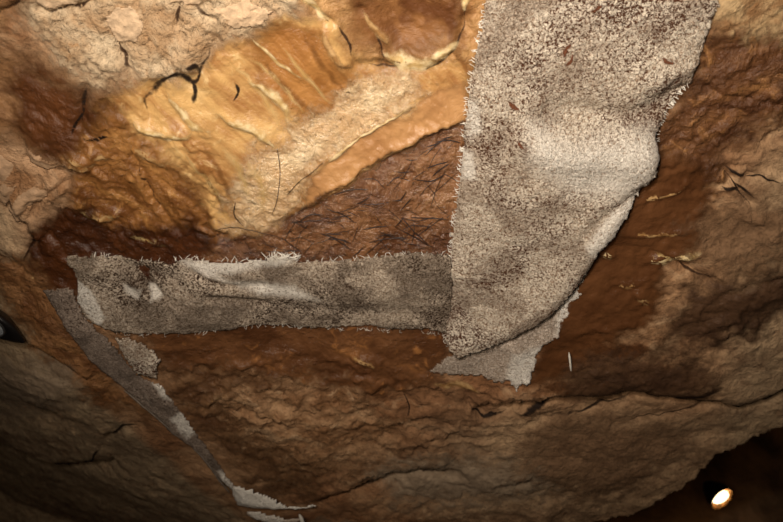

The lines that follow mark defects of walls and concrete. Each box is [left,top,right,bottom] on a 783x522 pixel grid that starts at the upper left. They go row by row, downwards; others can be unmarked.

crack [144,52,210,104]
crack [470,405,501,418]
crack [521,396,625,416]
crack [634,389,718,418]